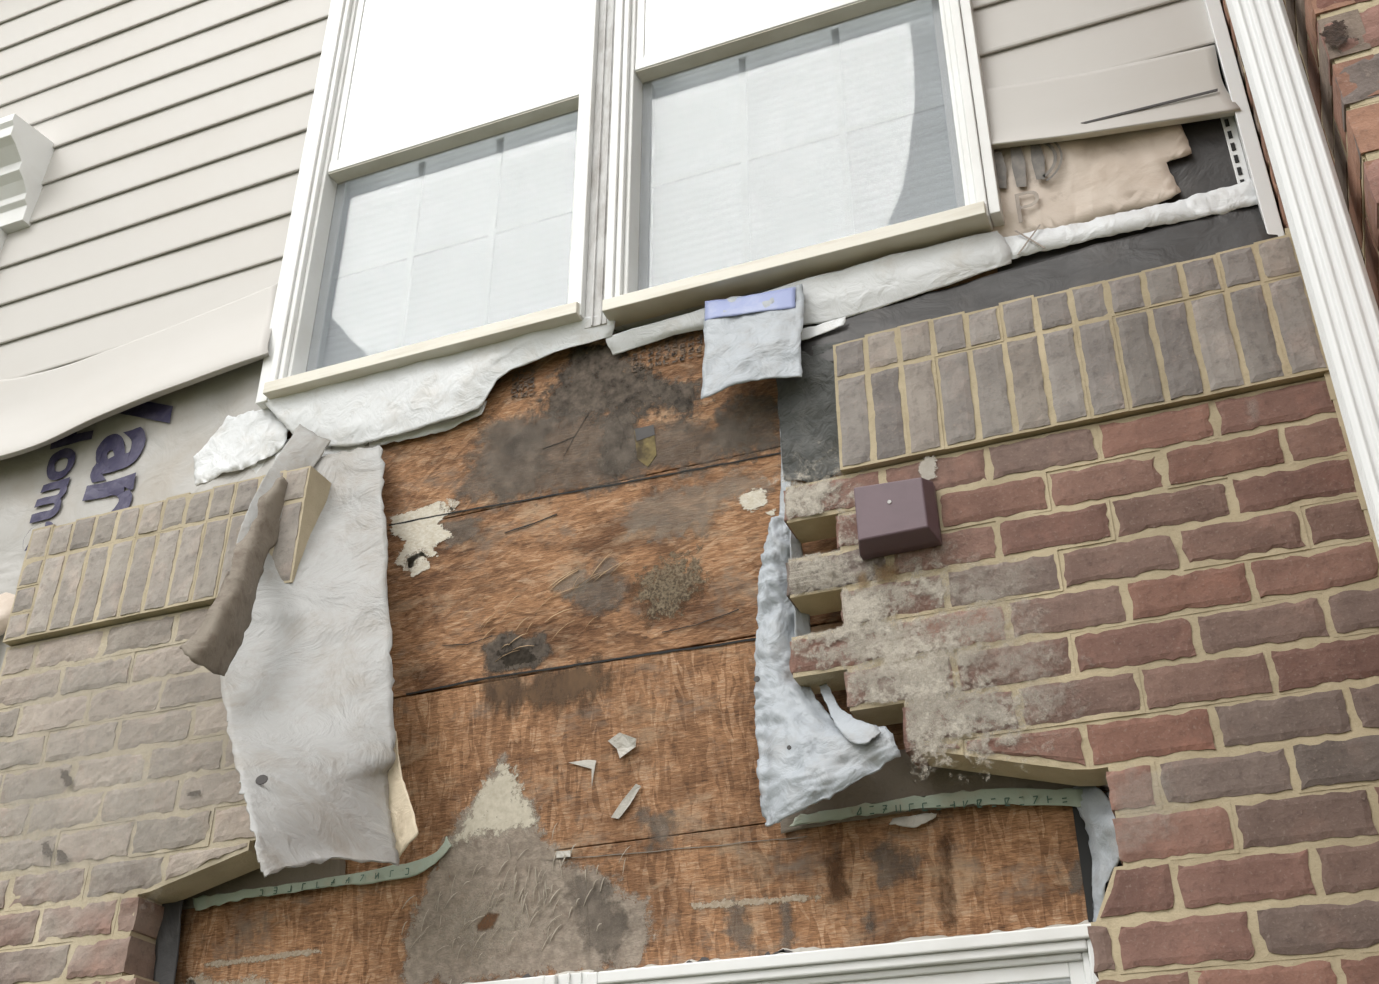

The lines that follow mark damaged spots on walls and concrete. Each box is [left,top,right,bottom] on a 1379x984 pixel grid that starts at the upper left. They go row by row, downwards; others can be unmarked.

damp [440,344,779,547]
peeling [407,552,430,577]
peeling [462,551,636,672]
damp [569,557,703,626]
peeling [401,825,605,963]
spalling [495,964,661,981]
spalling [765,947,842,955]
spalling [891,920,1090,943]